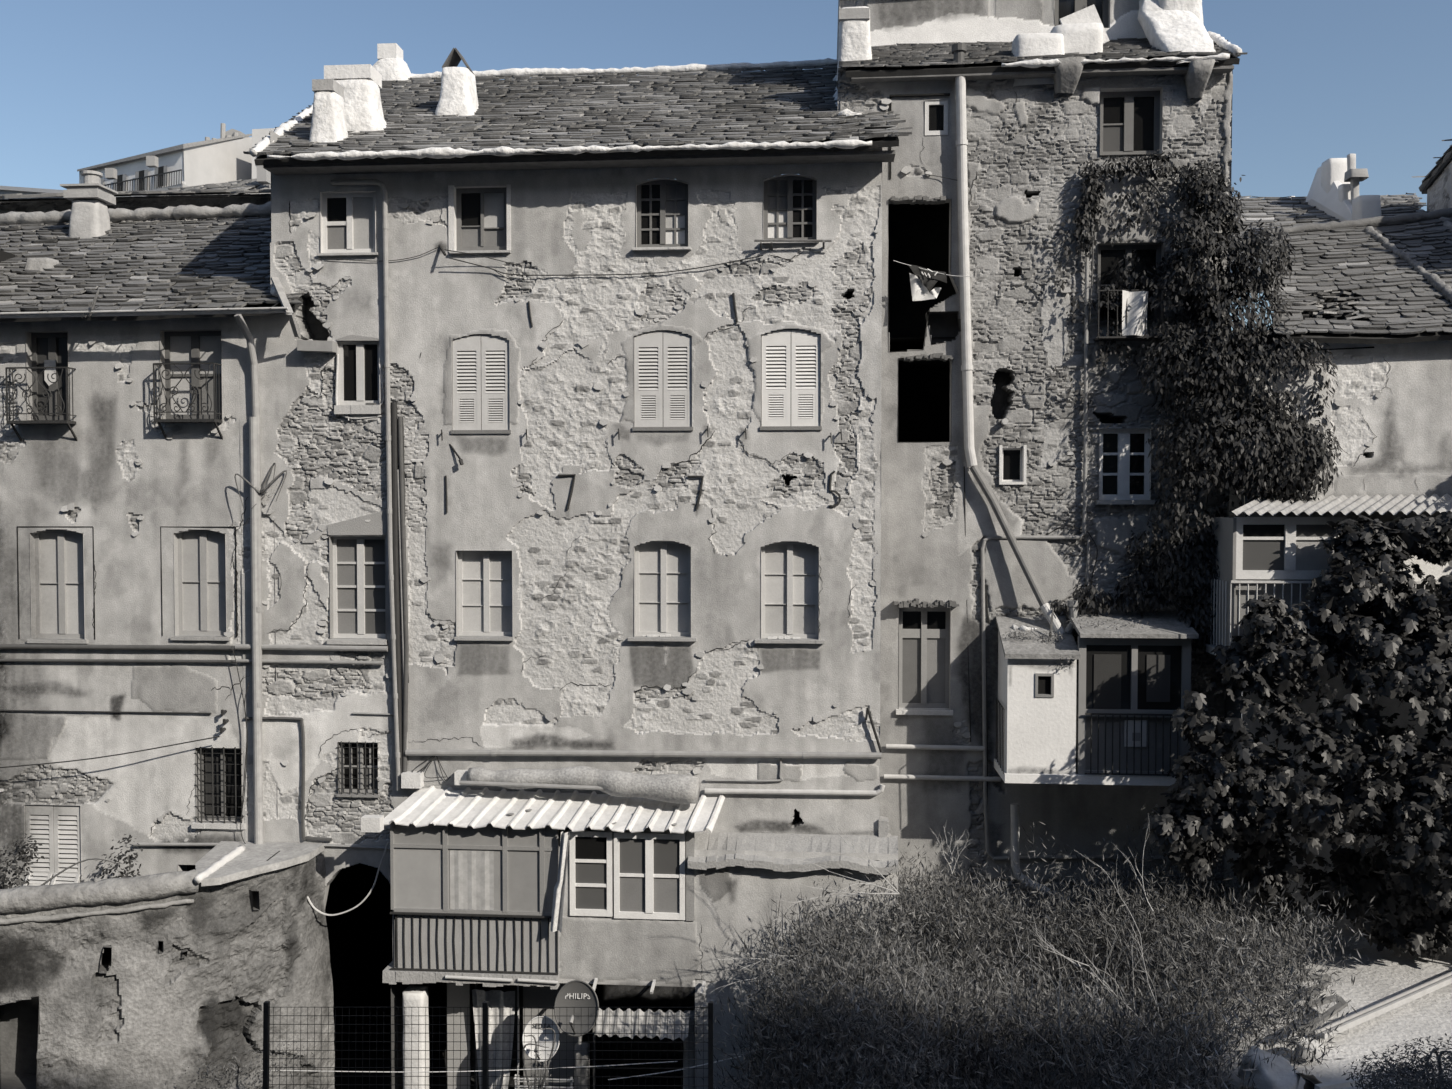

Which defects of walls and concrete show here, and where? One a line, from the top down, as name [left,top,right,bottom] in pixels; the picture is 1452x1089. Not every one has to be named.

flaking render [388,196,448,228]
spalling [288,198,337,396]
flaking render [972,358,1009,373]
flaking render [1039,283,1073,368]
flaking render [482,185,881,725]
flaking render [1040,427,1074,469]
flaking render [224,478,387,673]
flaking render [405,520,456,676]
flaking render [264,665,392,716]
flaking render [622,640,880,742]
flaking render [242,760,306,825]
flaking render [360,729,393,782]